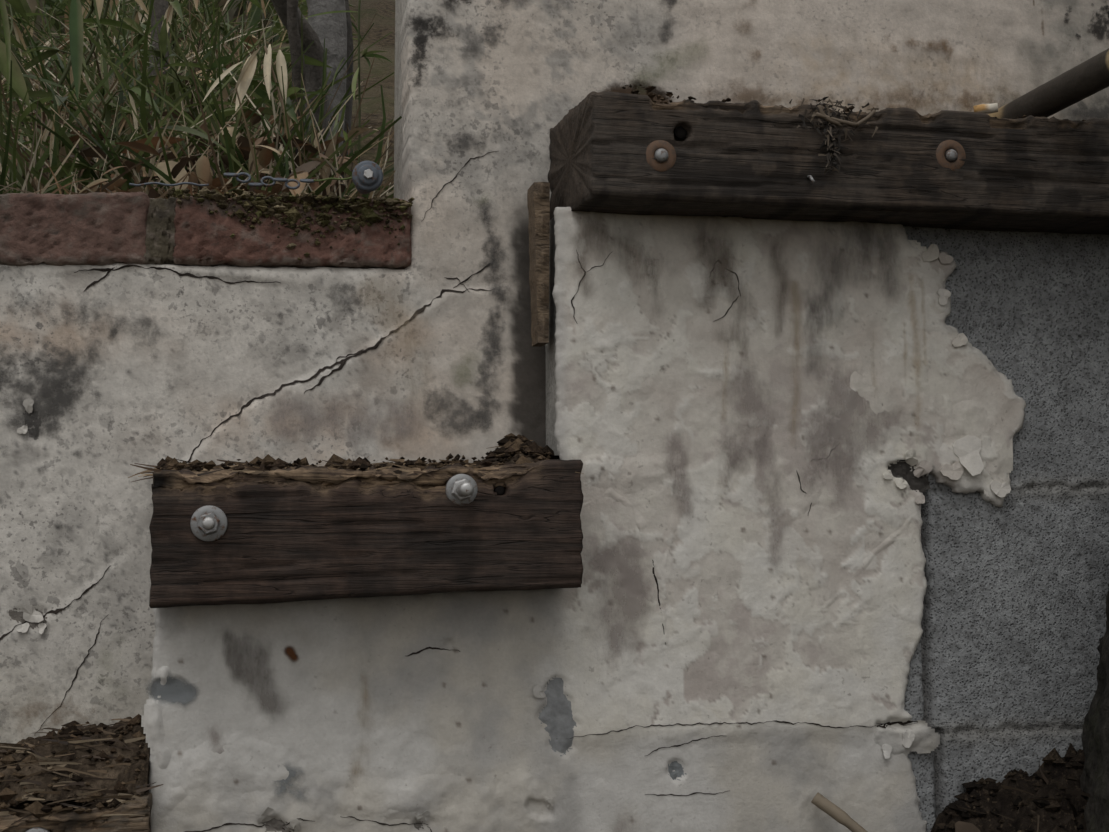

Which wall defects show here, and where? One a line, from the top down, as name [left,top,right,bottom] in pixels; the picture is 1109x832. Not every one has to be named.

mould [408,0,471,84]
mould [1076,5,1109,39]
crack [422,151,497,221]
crack [74,264,280,291]
peeling [902,240,954,315]
crack [186,259,496,463]
peeling [883,396,1013,504]
crack [0,566,110,640]
crack [35,614,109,733]
peeling [533,676,577,756]
crack [570,720,918,756]
crack [645,789,727,797]